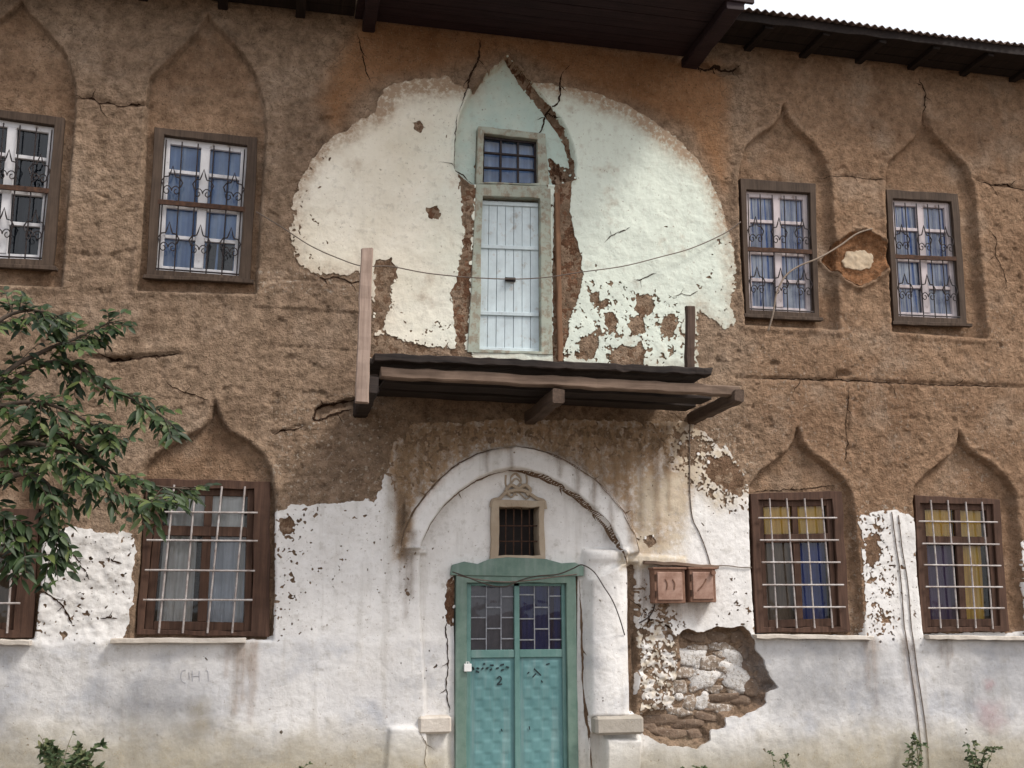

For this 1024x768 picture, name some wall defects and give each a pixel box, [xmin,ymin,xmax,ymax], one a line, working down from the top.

crack [77,91,145,117]
crack [538,65,570,133]
peeling [505,55,677,365]
peeling [370,177,476,358]
crack [96,353,178,366]
crack [273,399,354,436]
peeling [677,437,745,498]
peeling [863,532,883,569]
spalling [635,620,762,739]